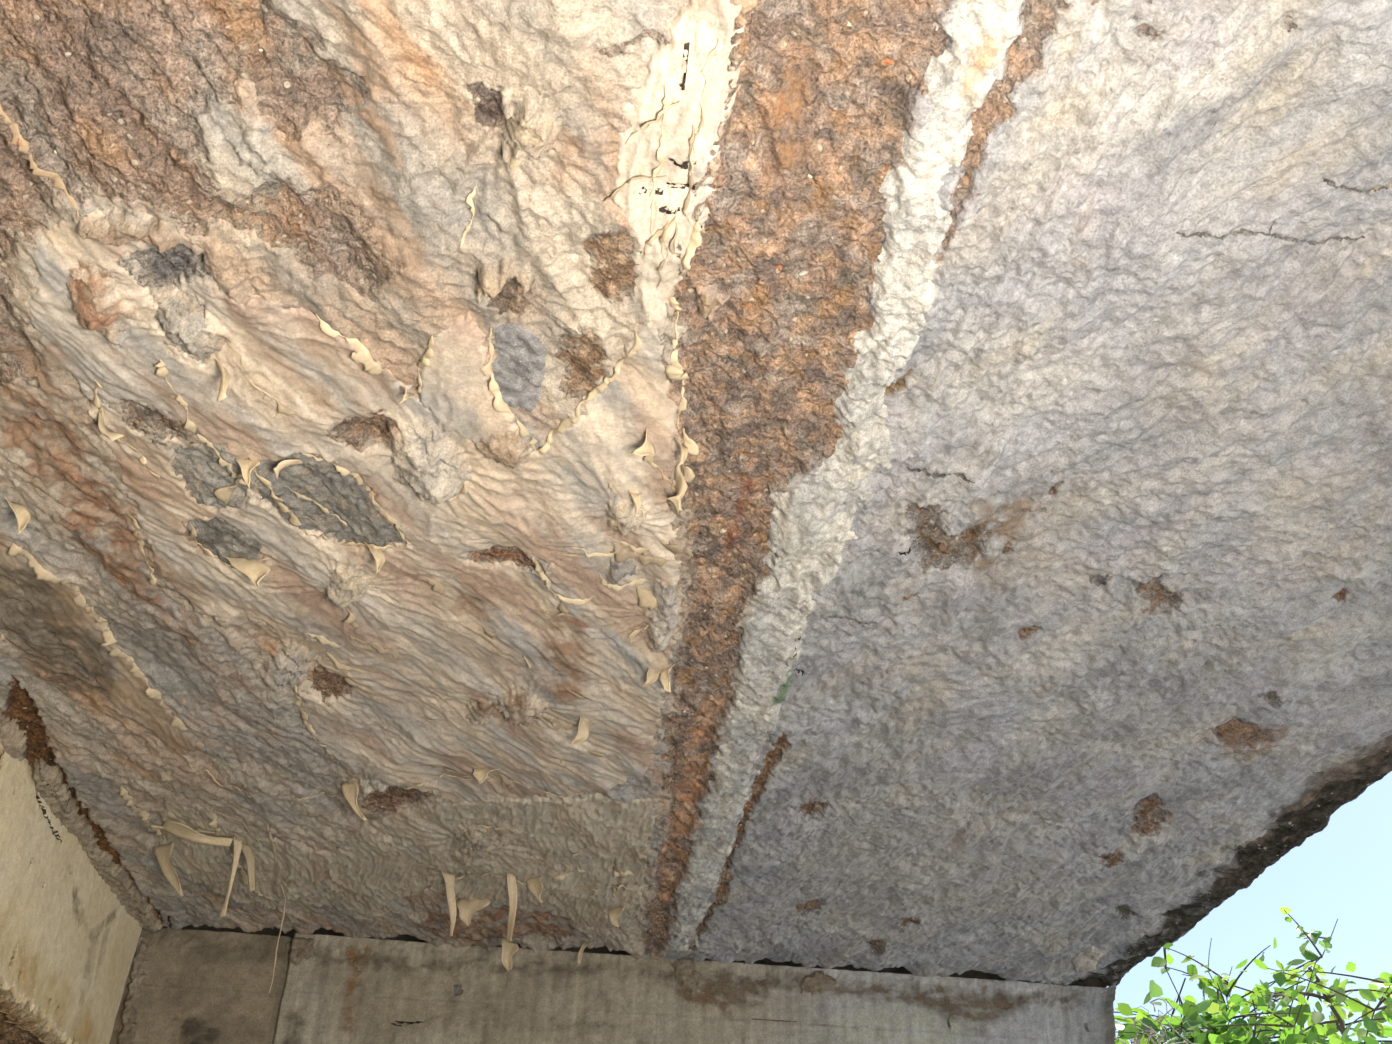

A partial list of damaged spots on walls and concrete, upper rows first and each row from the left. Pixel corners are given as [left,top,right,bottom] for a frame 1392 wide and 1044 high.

peeling [0,0,954,993]
spalling [902,501,1011,572]
spalling [1206,717,1274,747]
spalling [1258,691,1287,708]
crack [0,749,70,843]
rust [658,698,722,902]
spalling [1130,792,1172,837]
leakage [1212,735,1392,894]
spalling [1098,848,1126,868]